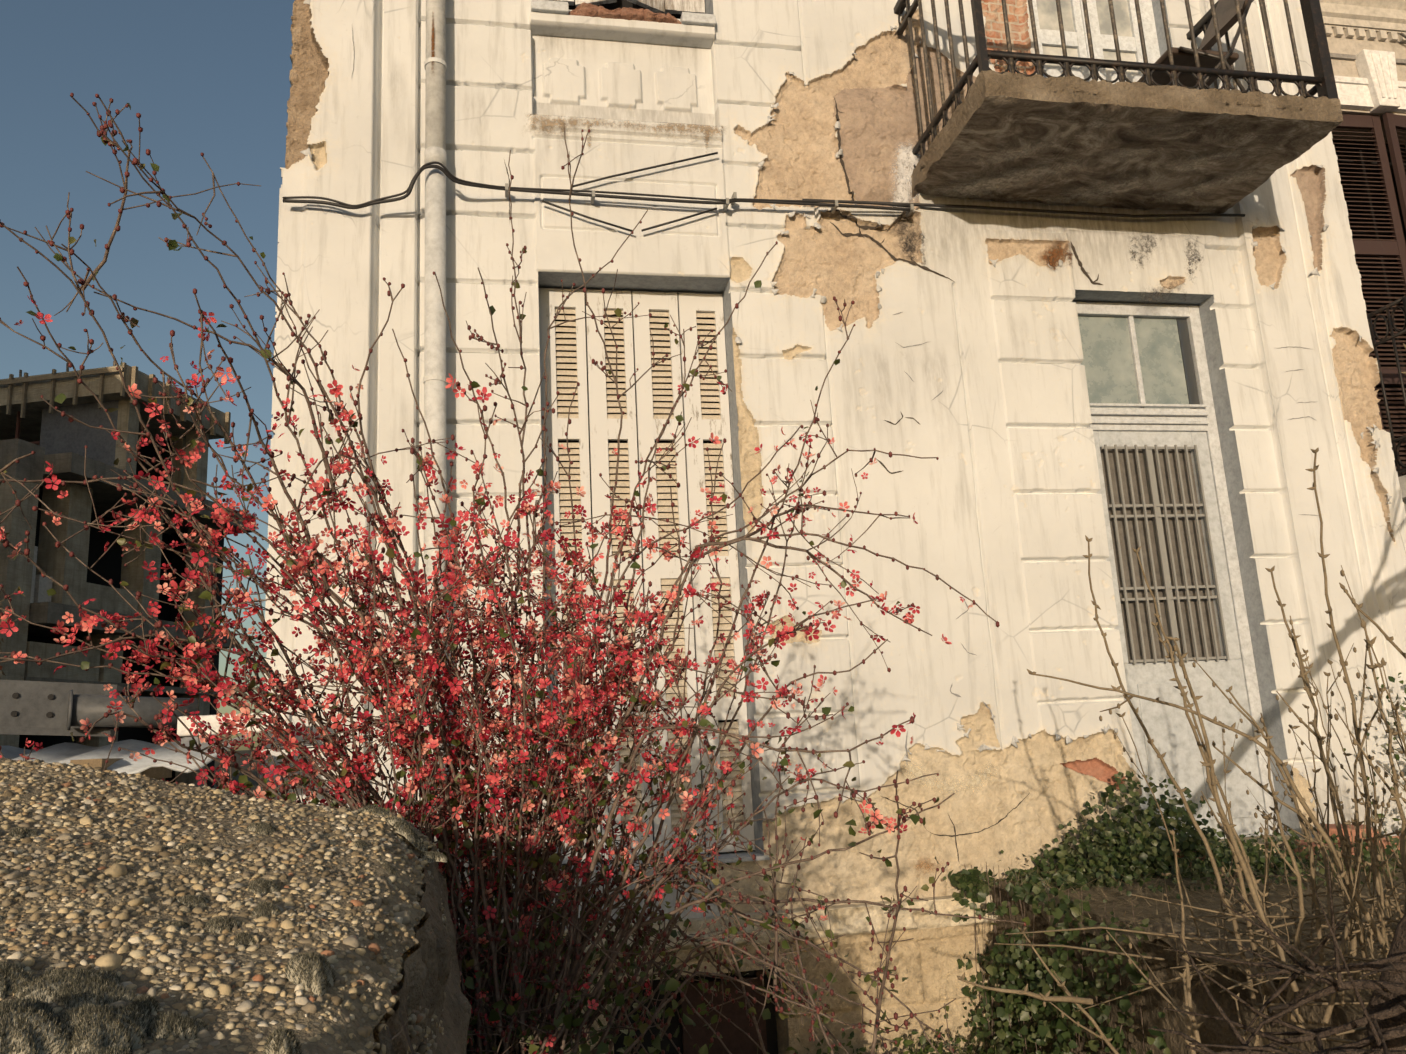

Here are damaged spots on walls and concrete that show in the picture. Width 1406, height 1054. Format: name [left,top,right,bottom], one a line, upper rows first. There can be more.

flaking render [285,0,329,170]
peeling [730,257,752,283]
flaking render [734,8,923,331]
flaking render [981,0,1036,75]
flaking render [985,238,1069,268]
flaking render [1251,224,1287,290]
flaking render [1290,165,1329,276]
flaking render [732,328,763,537]
flaking render [1329,326,1395,542]
flaking render [710,702,1142,915]